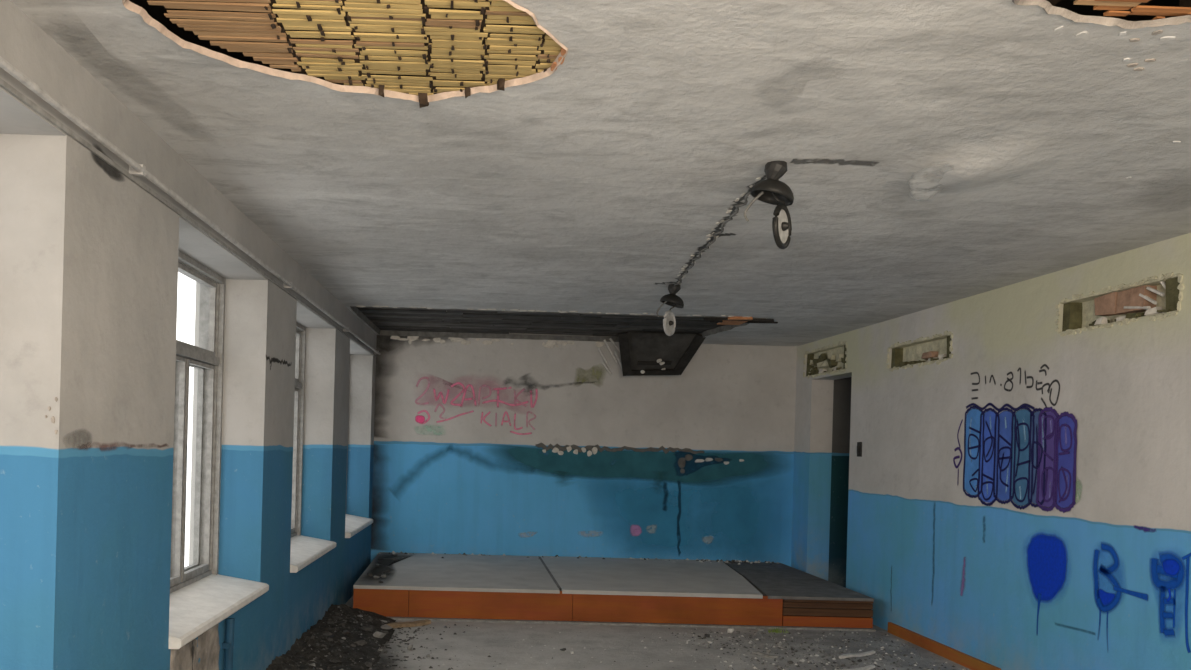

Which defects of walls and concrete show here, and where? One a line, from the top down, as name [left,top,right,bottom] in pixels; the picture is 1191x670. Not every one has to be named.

flaking render [1012,0,1191,42]
flaking render [122,0,568,102]
flaking render [1054,272,1185,336]
crack [266,356,291,370]
spalling [886,331,953,372]
peeling [536,443,744,476]
damp [500,446,776,554]